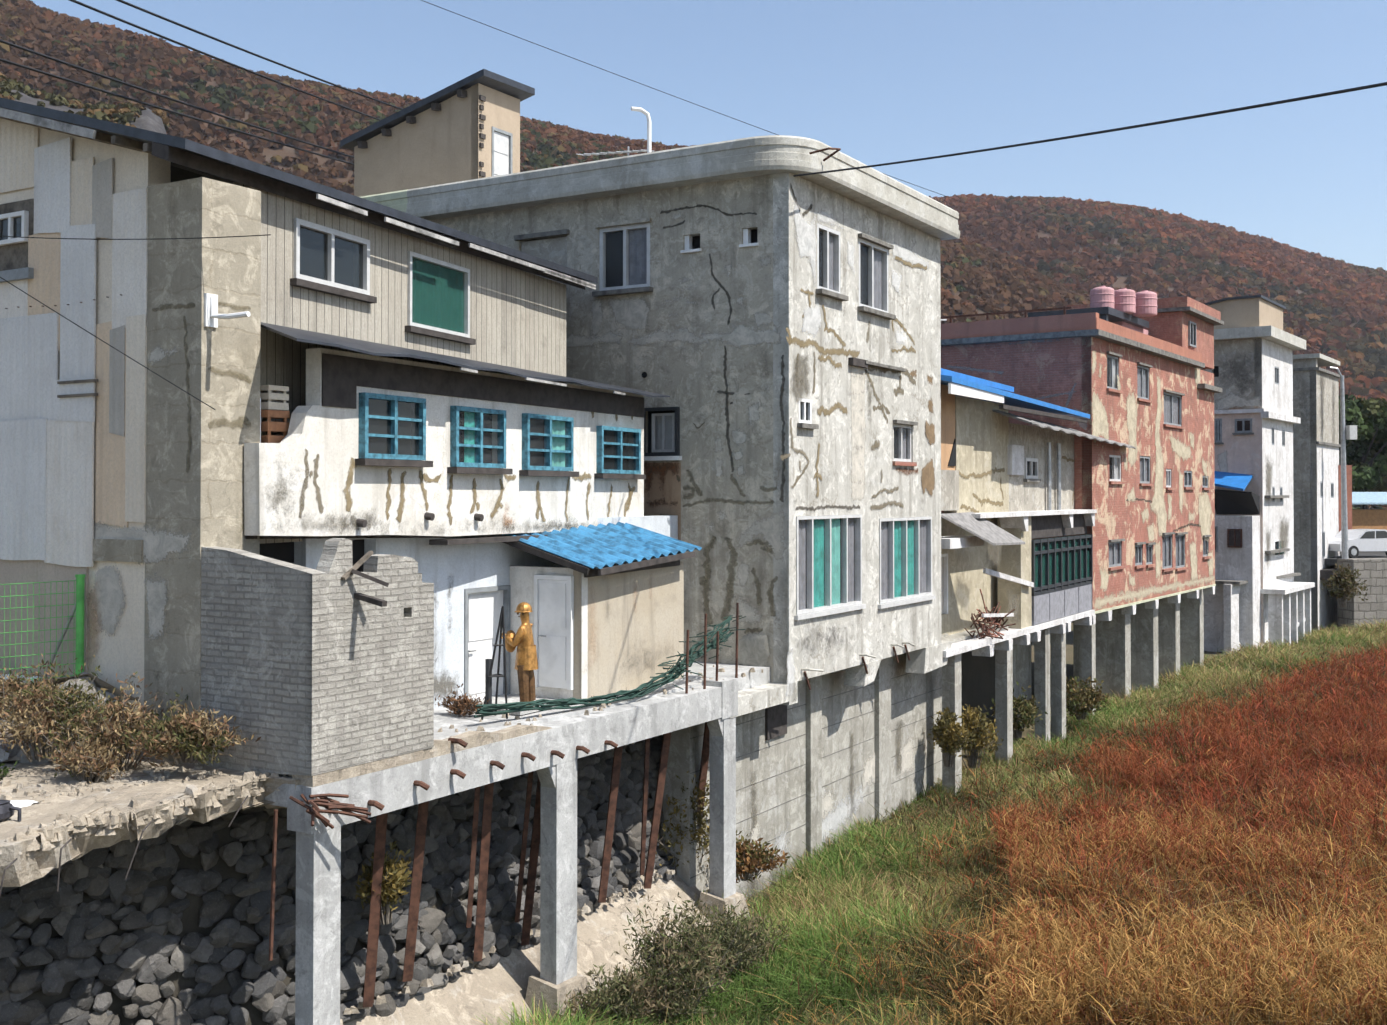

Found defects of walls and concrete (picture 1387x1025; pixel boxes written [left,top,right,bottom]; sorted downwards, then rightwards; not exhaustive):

crack [660,204,757,229]
crack [790,184,812,216]
crack [895,257,927,270]
crack [676,254,916,512]
spalling [910,365,1004,496]
peeling [1034,348,1138,470]
peeling [1094,376,1228,610]
crack [700,537,777,633]